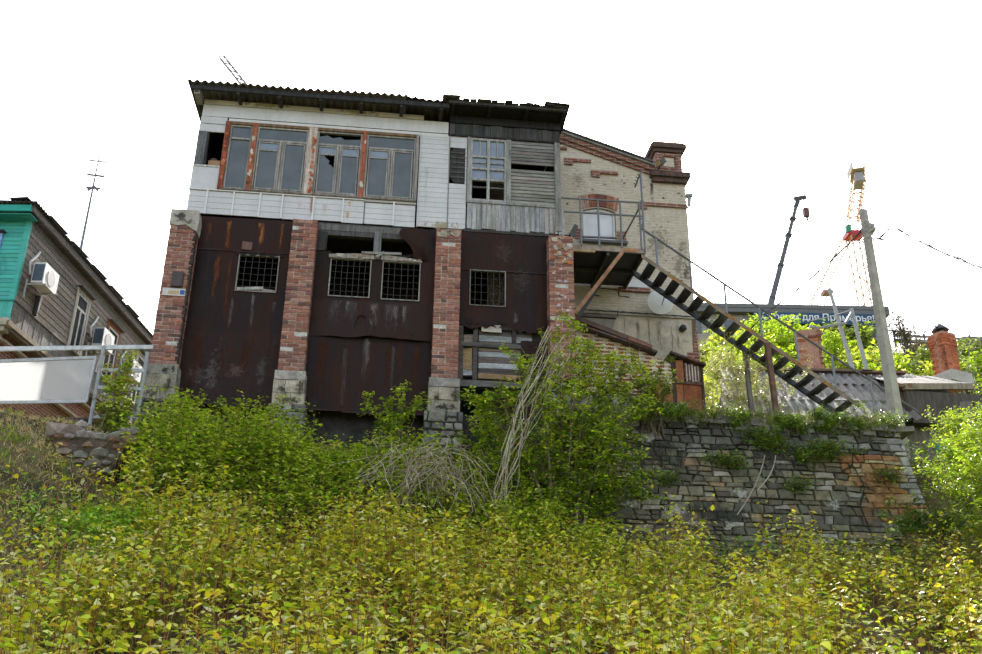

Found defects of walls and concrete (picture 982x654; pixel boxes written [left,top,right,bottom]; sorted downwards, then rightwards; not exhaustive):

peeling [307,136,317,193]